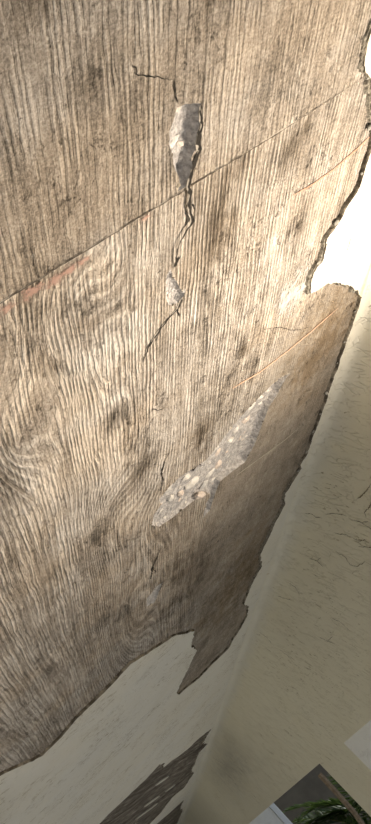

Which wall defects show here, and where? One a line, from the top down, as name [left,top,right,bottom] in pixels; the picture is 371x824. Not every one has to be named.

crack [130,59,178,102]
flaking render [0,0,371,306]
crack [174,106,203,268]
crack [142,299,183,362]
flaking render [326,286,362,393]
spalling [150,373,289,527]
flaking render [312,394,328,431]
flaking render [258,467,300,567]
spalling [146,583,162,606]
flaking render [177,605,249,694]
flaking render [0,629,194,776]
flaking render [100,730,210,824]